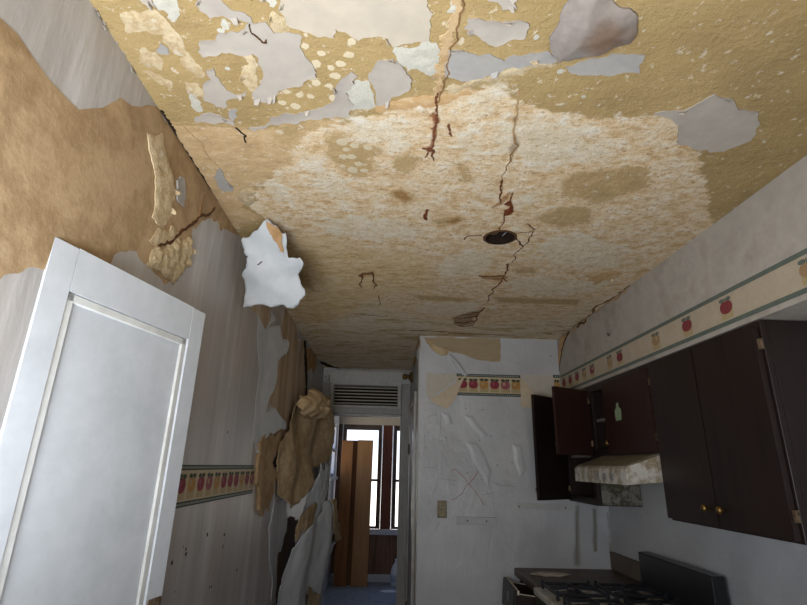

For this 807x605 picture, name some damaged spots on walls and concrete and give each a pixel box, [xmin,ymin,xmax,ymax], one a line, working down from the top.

peeling [116,0,645,131]
crack [433,0,465,103]
flaking render [0,19,259,284]
crack [158,110,248,247]
crack [501,90,520,191]
peeling [654,94,760,153]
crack [464,216,535,263]
flaking render [250,304,271,329]
flaking render [267,308,317,457]